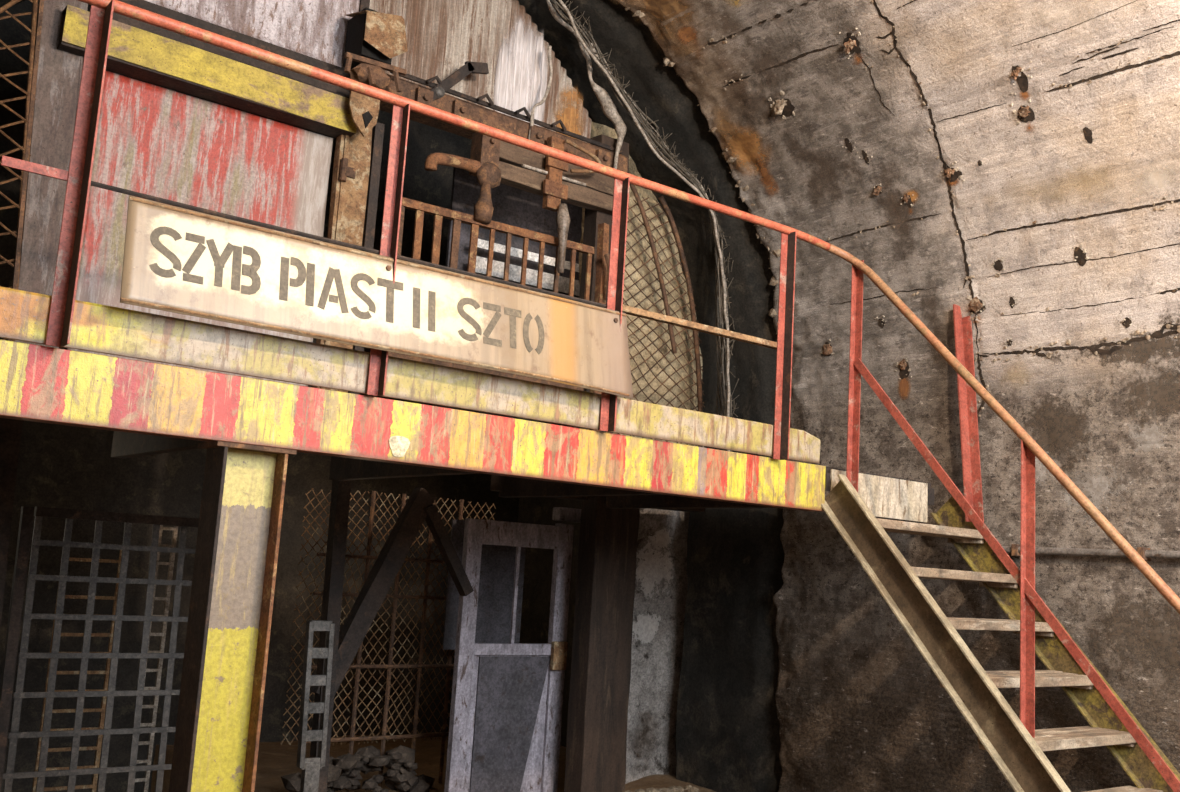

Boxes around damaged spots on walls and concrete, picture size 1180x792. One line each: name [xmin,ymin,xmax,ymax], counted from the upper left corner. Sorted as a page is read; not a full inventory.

rust [627,0,700,55]
crack [703,0,817,49]
rust [716,109,778,194]
crack [723,0,1180,422]